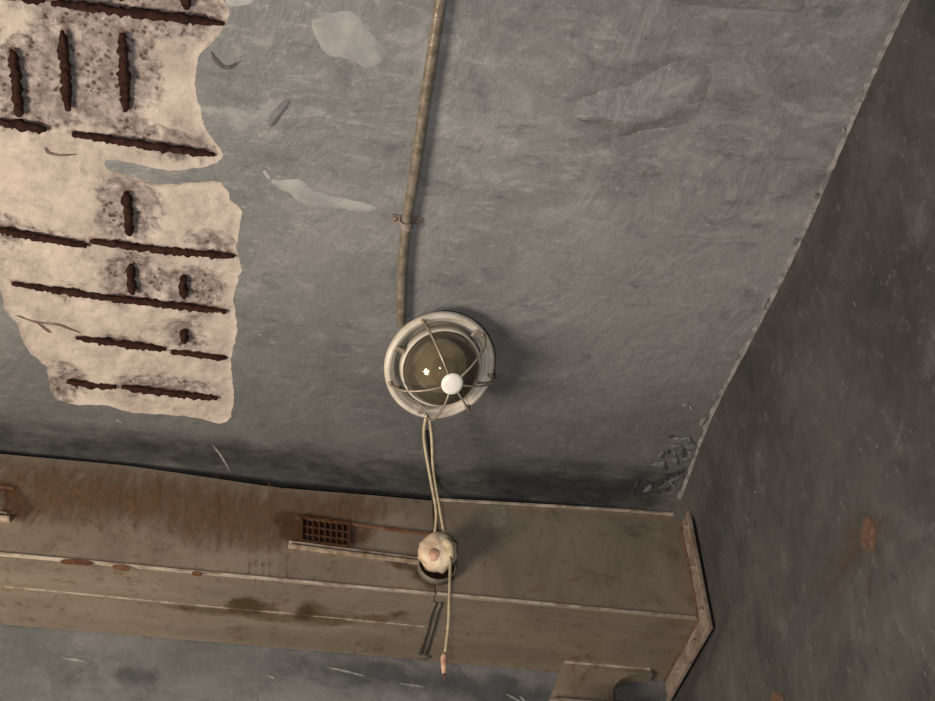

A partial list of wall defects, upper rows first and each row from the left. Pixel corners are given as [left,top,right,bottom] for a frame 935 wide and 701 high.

peeling [312,11,382,68]
spalling [0,0,254,424]
peeling [263,170,377,213]
water stain [208,600,272,619]
water stain [282,605,343,625]